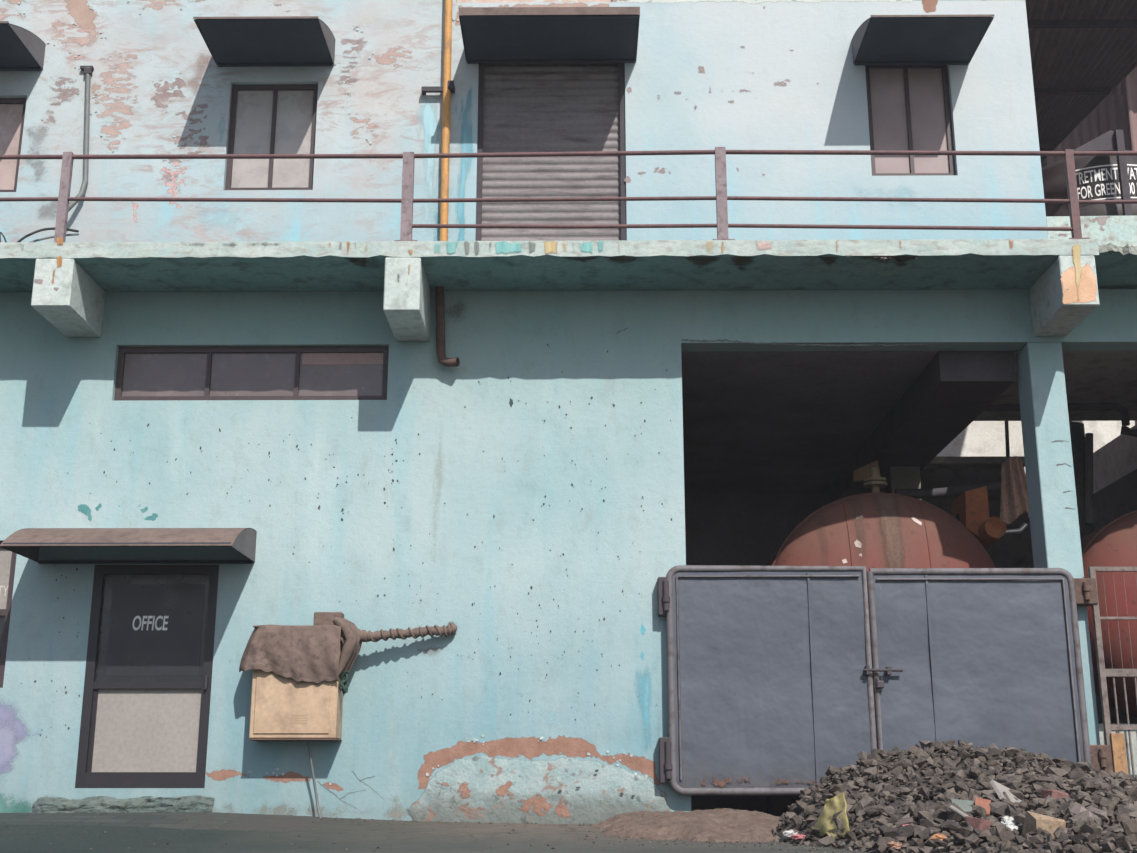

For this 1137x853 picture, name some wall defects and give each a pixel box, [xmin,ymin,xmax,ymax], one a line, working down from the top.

peeling [0,0,26,21]
peeling [128,0,204,14]
peeling [498,0,938,13]
peeling [41,0,138,152]
peeling [151,73,209,208]
flaking render [1061,263,1097,304]
peeling [417,668,660,789]
peeling [206,767,310,783]
peeling [324,782,344,792]